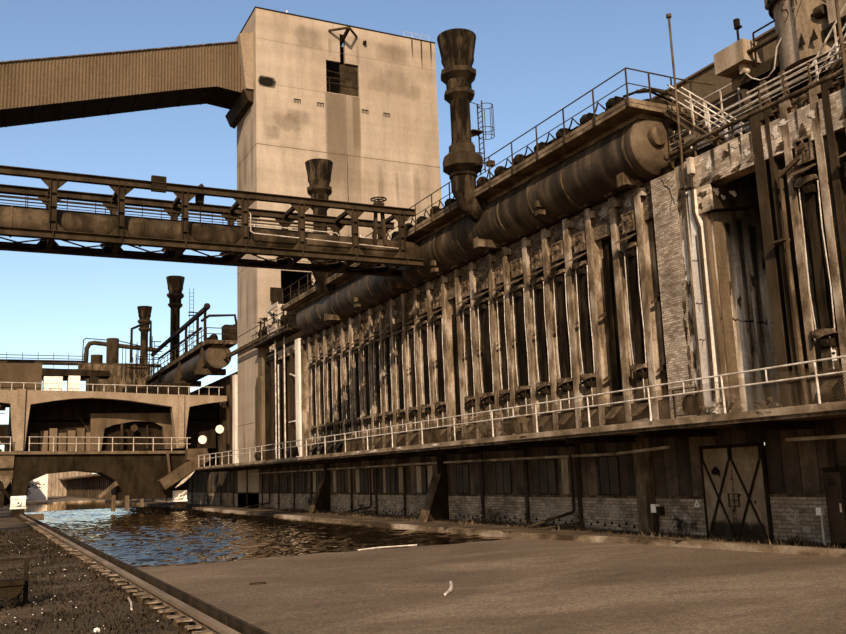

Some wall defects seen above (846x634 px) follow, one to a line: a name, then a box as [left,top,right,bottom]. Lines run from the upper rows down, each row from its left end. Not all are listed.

peeling [772,119,788,152]
spalling [799,110,815,137]
spalling [698,142,755,210]
spalling [678,189,702,390]